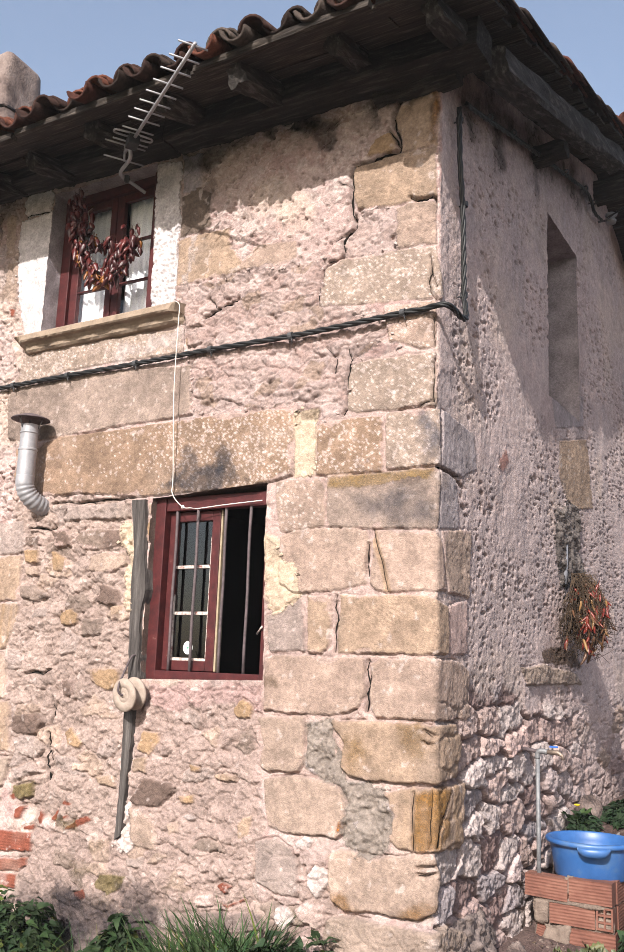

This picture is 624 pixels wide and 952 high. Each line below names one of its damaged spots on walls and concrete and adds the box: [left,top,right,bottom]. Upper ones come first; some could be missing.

crack [319,120,403,301]
water stain [168,455,232,491]
crack [368,530,389,592]
crack [365,661,373,712]
crack [47,703,57,780]